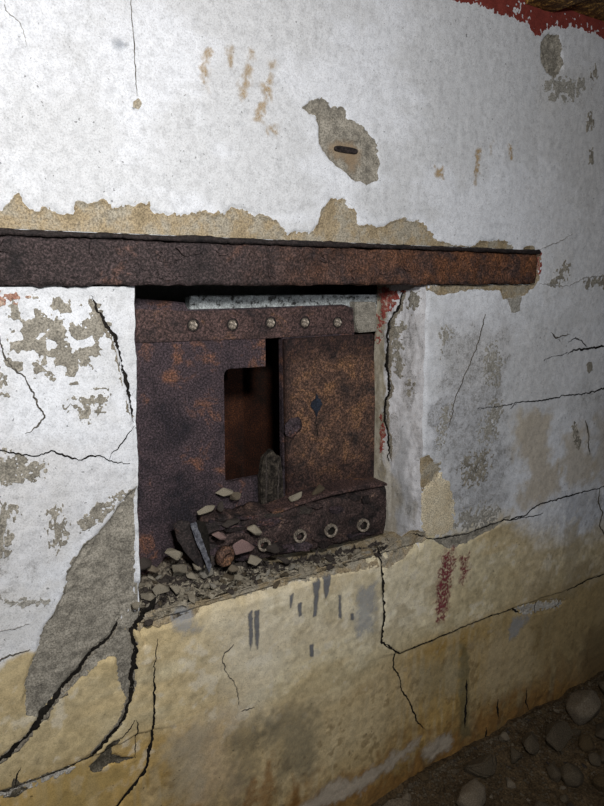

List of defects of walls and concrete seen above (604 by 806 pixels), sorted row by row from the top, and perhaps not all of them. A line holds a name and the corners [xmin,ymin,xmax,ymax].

spalling [302,97,380,185]
spalling [0,193,513,249]
peeling [0,290,112,398]
crack [0,296,134,464]
crack [383,289,406,461]
corrosion [206,520,269,561]
corrosion [317,528,379,549]
damp [248,610,259,648]
spalling [0,486,511,717]
damp [313,575,331,617]
crack [0,595,159,806]
damp [301,734,453,806]